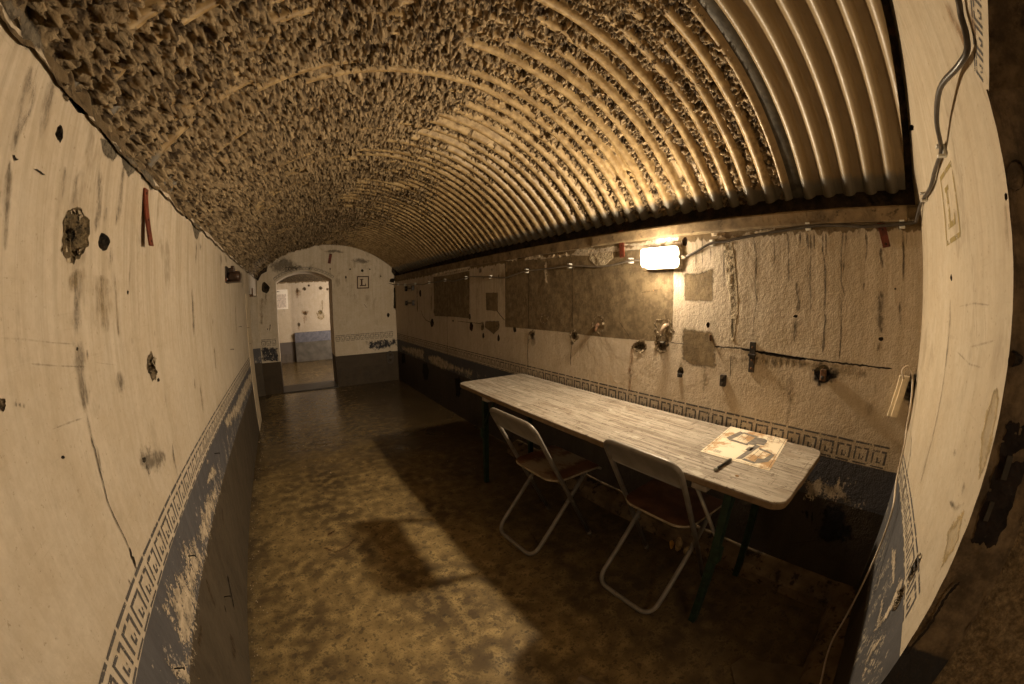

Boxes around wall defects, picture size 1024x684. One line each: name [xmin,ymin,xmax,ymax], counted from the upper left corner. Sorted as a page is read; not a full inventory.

peeling [15,0,784,317]
spalling [147,351,160,382]
peeling [224,373,252,427]
spalling [631,318,675,354]
crack [715,346,892,376]
leakage [787,233,839,386]
crack [91,438,137,584]
peeling [162,459,220,684]
peeling [862,549,922,678]